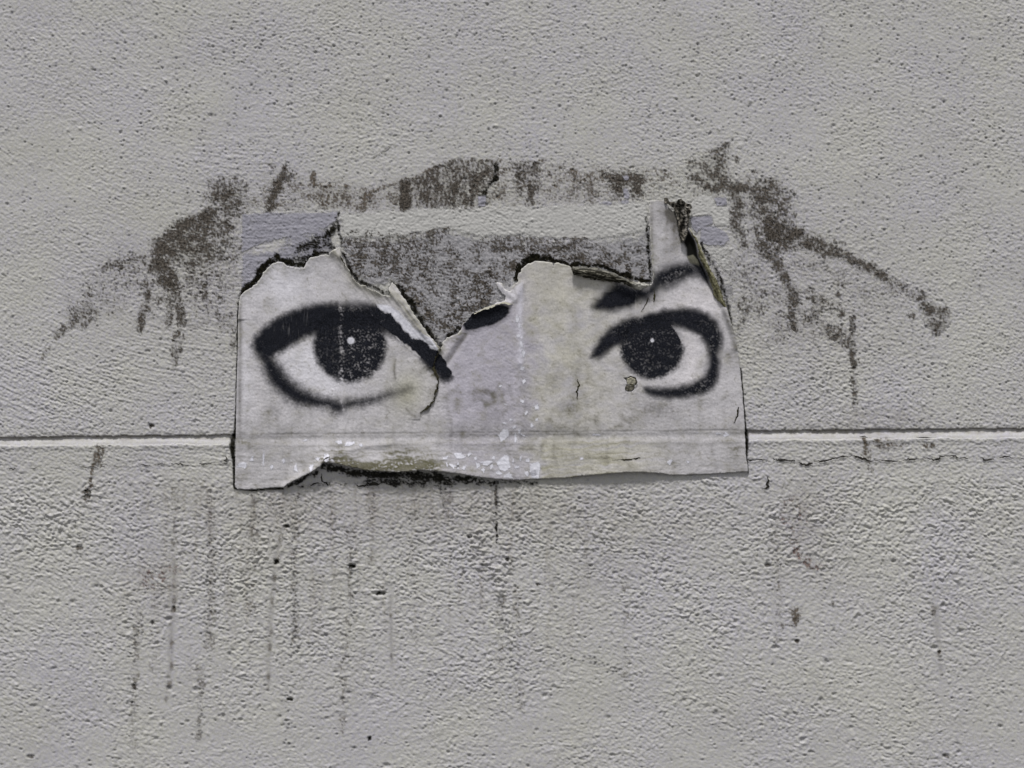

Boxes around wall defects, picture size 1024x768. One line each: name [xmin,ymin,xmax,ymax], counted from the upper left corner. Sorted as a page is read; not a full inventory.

peeling [241,202,653,342]
peeling [691,196,733,296]
crack [747,436,1023,489]